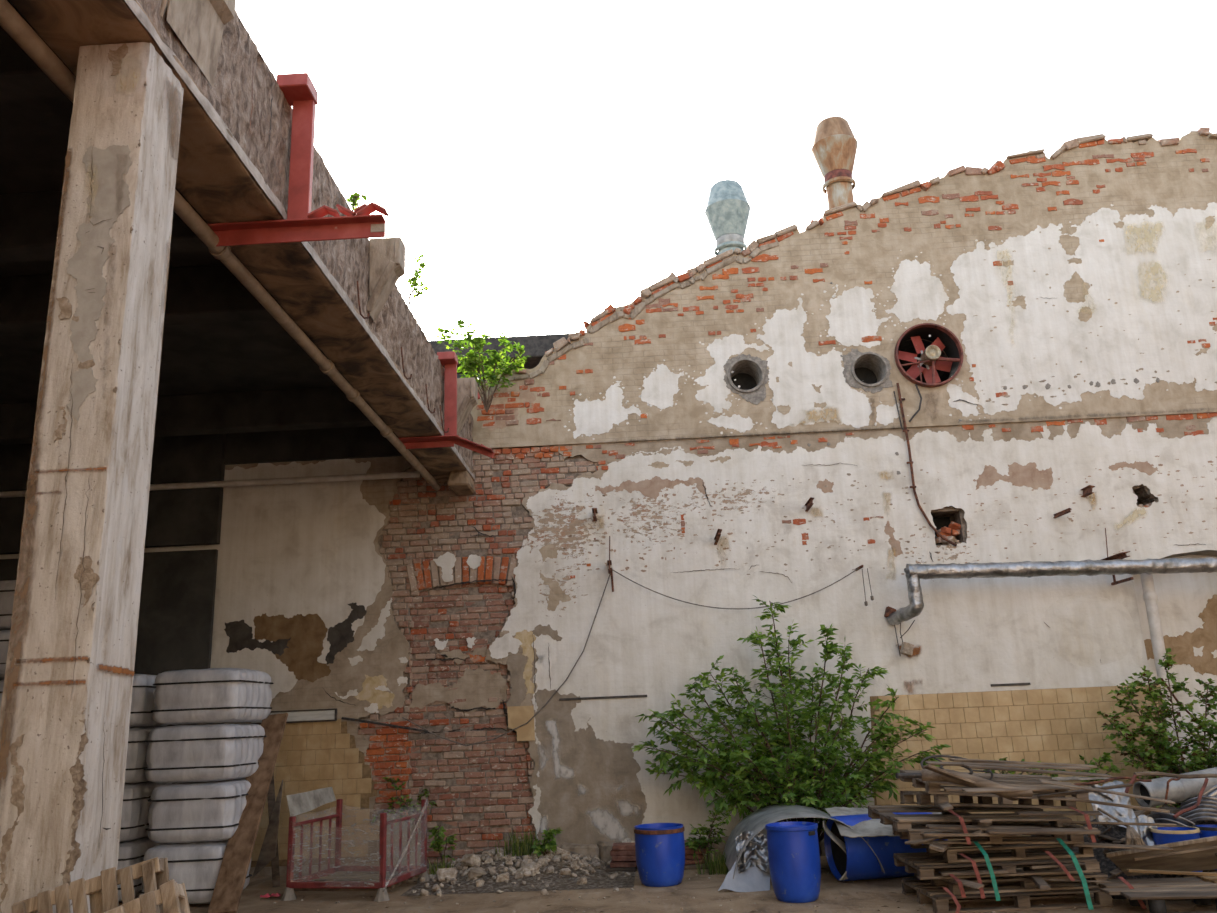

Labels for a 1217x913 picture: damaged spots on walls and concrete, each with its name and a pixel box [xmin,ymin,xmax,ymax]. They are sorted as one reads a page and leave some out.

spalling [108,43,129,76]
spalling [56,297,80,322]
peeling [335,149,1217,847]
spalling [74,556,100,611]
flaking render [253,613,331,683]
crack [425,653,466,661]
crack [532,634,551,702]
crack [420,700,517,738]
spalling [0,734,25,913]
spalling [60,710,89,885]